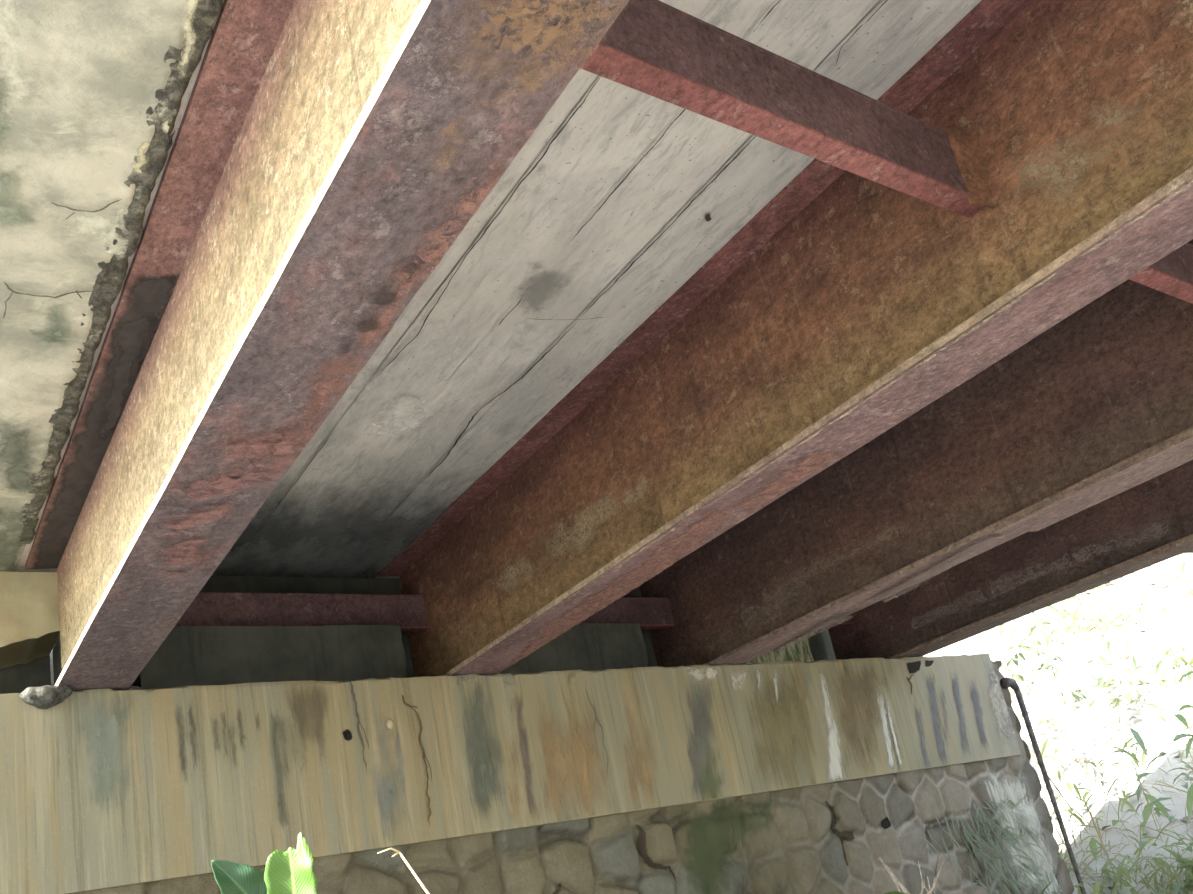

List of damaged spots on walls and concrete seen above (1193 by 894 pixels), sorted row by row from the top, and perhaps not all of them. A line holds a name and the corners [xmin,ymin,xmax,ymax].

corrosion [473,0,619,97]
crack [51,199,122,220]
crack [3,282,115,319]
spalling [19,0,223,544]
leakage [212,493,448,579]
crack [402,695,432,824]
leakage [466,692,498,805]
leakage [518,702,534,810]
leakage [689,685,721,797]
leakage [755,673,815,784]
leakage [821,673,902,780]